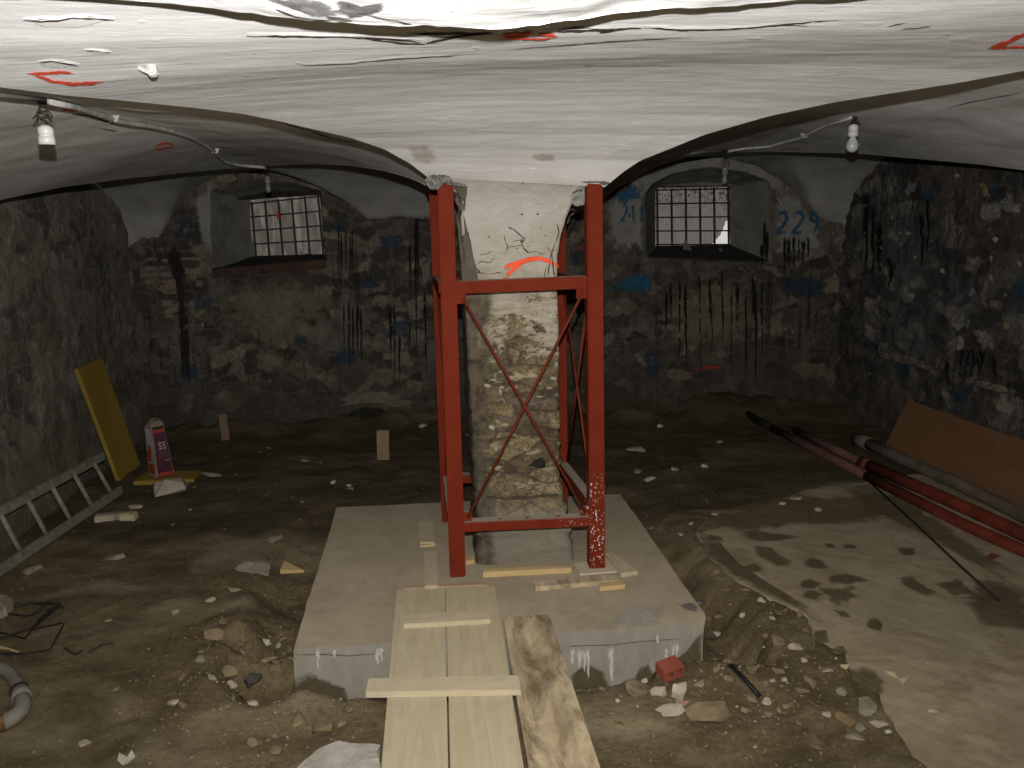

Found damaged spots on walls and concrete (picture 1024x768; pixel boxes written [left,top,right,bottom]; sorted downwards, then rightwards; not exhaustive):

crack [513,20,838,50]
spalling [425,174,478,280]
crack [468,225,559,277]
damp [783,237,810,269]
damp [169,249,190,375]
damp [338,229,362,364]
damp [665,273,763,374]
damp [570,648,614,691]
damp [636,666,653,681]
damp [656,634,701,663]